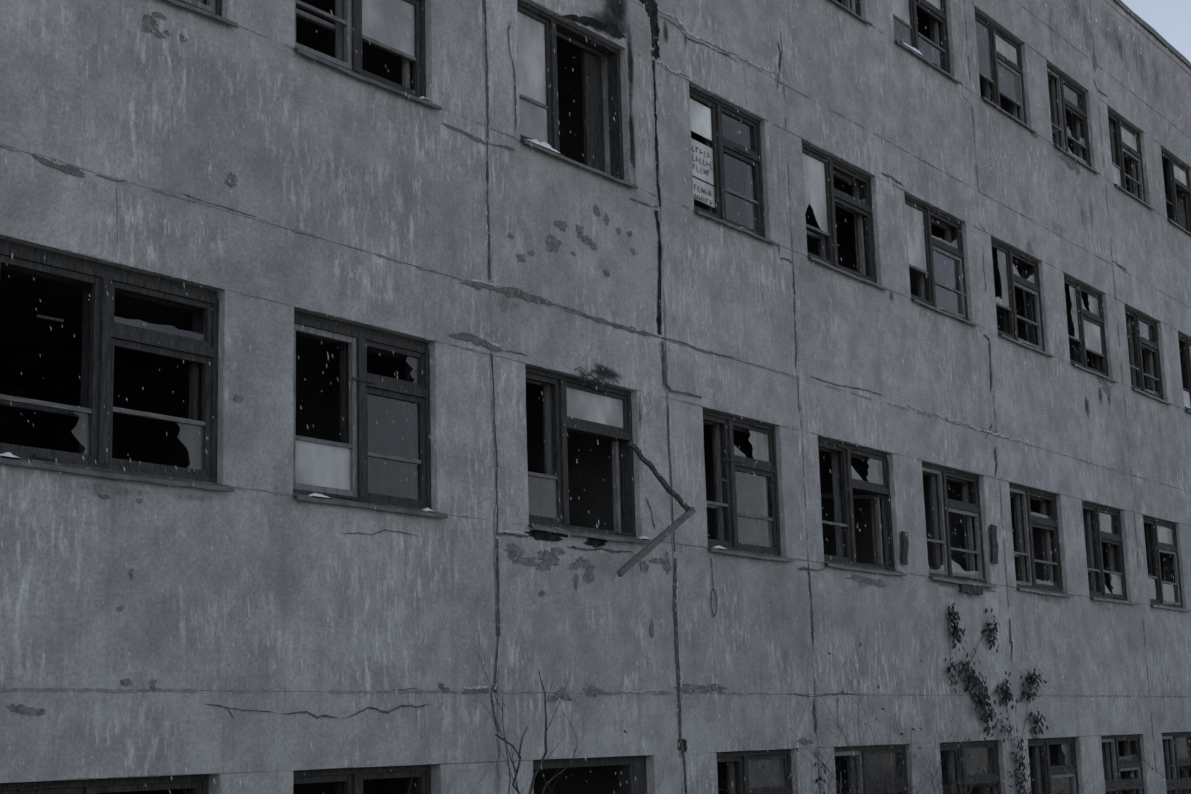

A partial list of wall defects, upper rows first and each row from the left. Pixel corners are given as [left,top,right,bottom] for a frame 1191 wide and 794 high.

crack [508,19,517,138]
spalling [516,220,598,262]
spalling [594,204,636,255]
spalling [498,525,607,630]
crack [207,688,429,719]